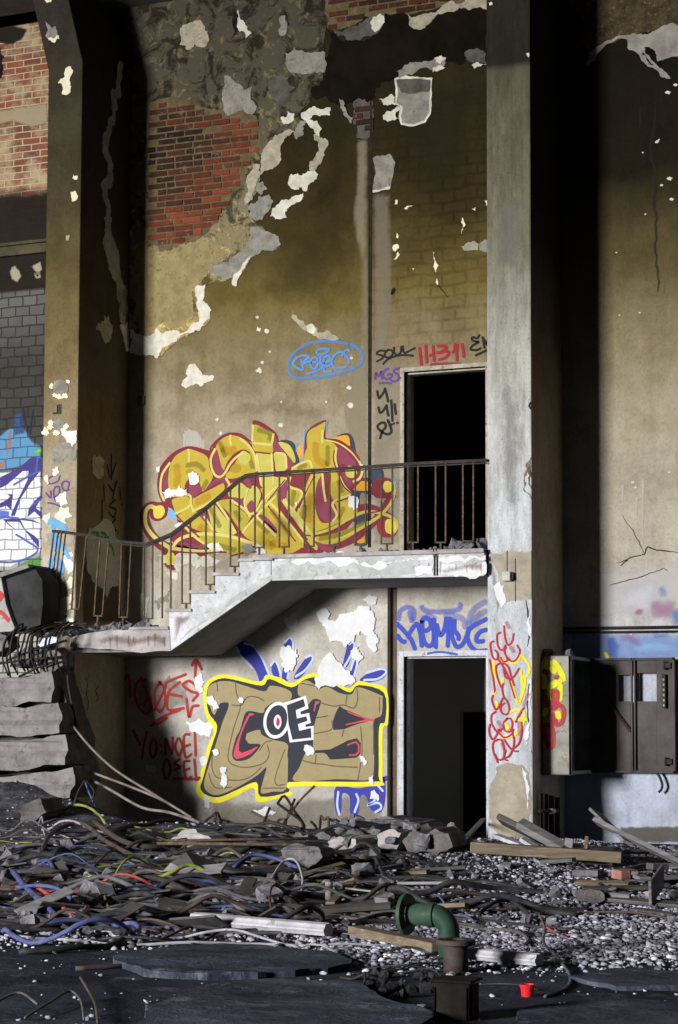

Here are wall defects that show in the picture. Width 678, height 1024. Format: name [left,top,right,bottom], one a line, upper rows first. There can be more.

flaking render [571,0,678,94]
flaking render [96,0,493,358]
peeling [181,364,215,388]
crack [611,515,678,585]
peeling [280,645,299,673]
peeling [314,594,379,689]
peeling [359,756,380,801]